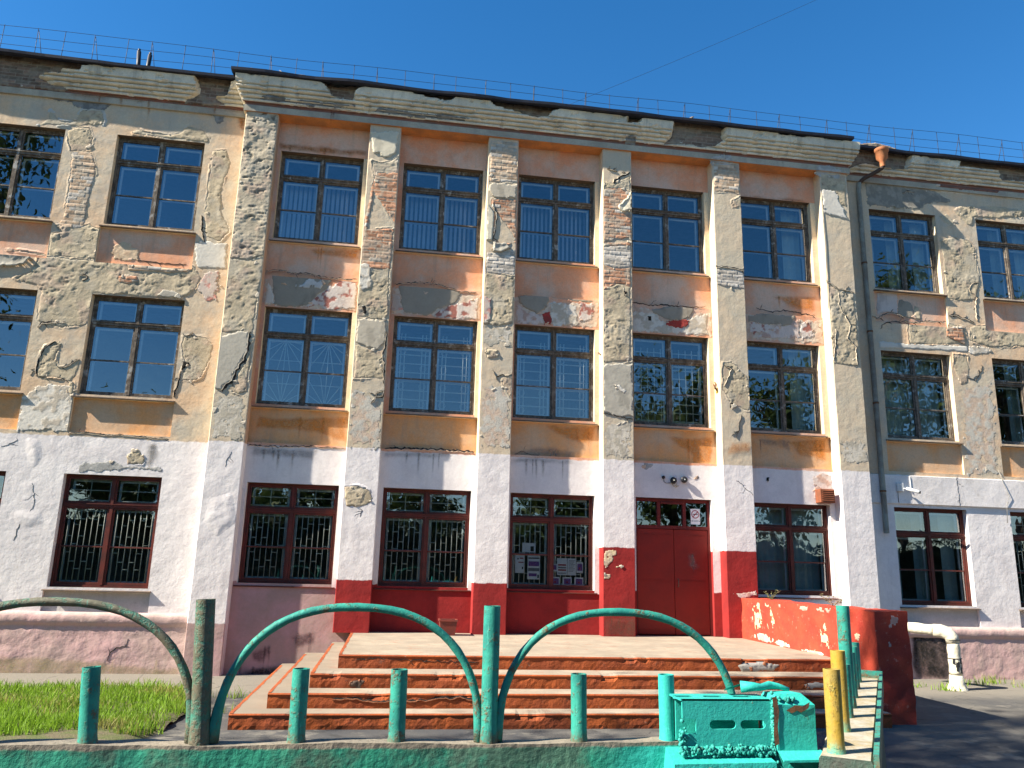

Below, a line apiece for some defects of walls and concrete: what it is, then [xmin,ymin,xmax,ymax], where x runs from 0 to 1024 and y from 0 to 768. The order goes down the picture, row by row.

flaking render [0,55,712,450]
flaking render [746,287,860,367]
flaking render [344,483,373,507]
peeling [604,550,624,579]
peeling [733,591,831,655]